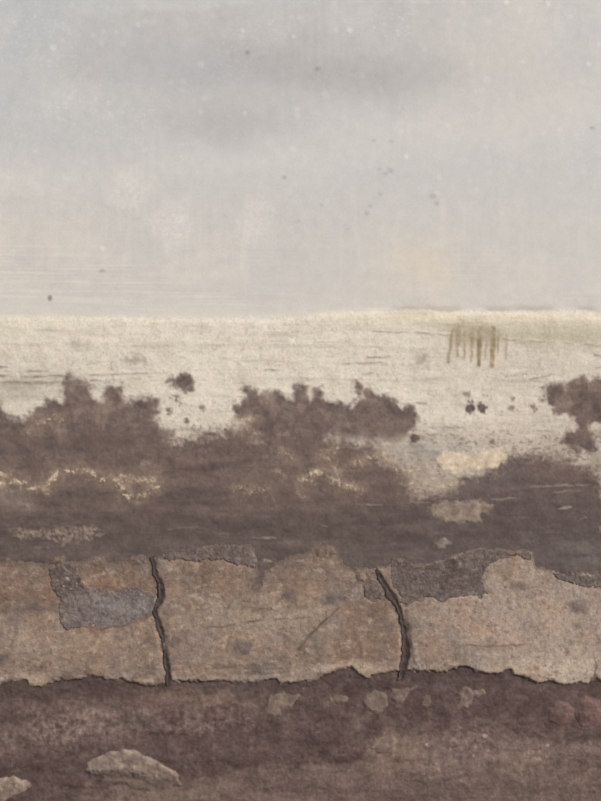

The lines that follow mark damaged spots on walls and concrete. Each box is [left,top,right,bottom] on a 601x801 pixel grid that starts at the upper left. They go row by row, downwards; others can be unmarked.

rust [445,338,509,369]
peeling [425,496,496,527]
spalling [49,562,157,631]
crack [83,556,170,685]
crack [372,568,416,680]
spalling [363,535,533,607]